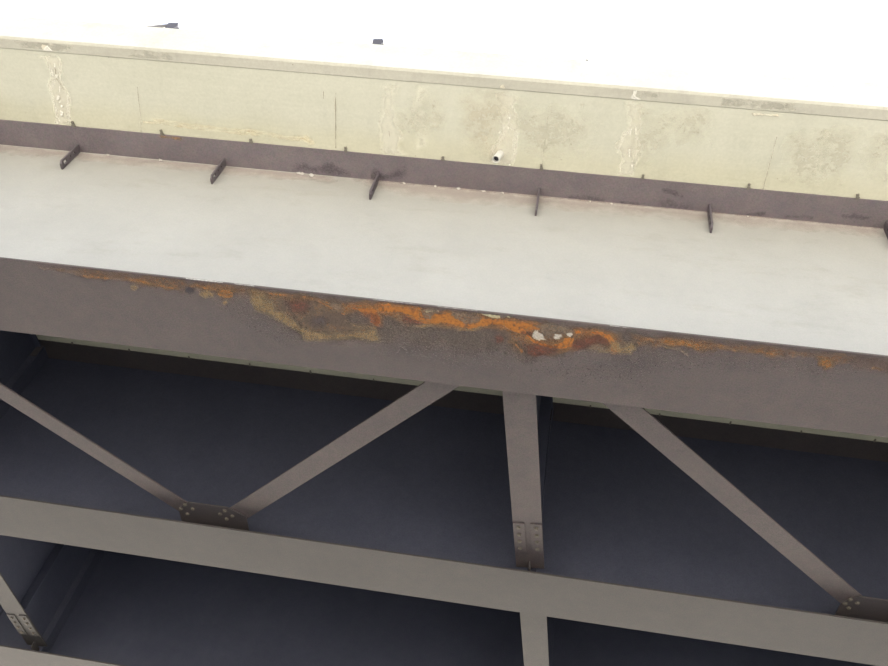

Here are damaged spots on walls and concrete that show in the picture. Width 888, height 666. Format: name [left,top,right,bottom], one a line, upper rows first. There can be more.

rust [56,268,888,373]
peeling [532,330,573,341]